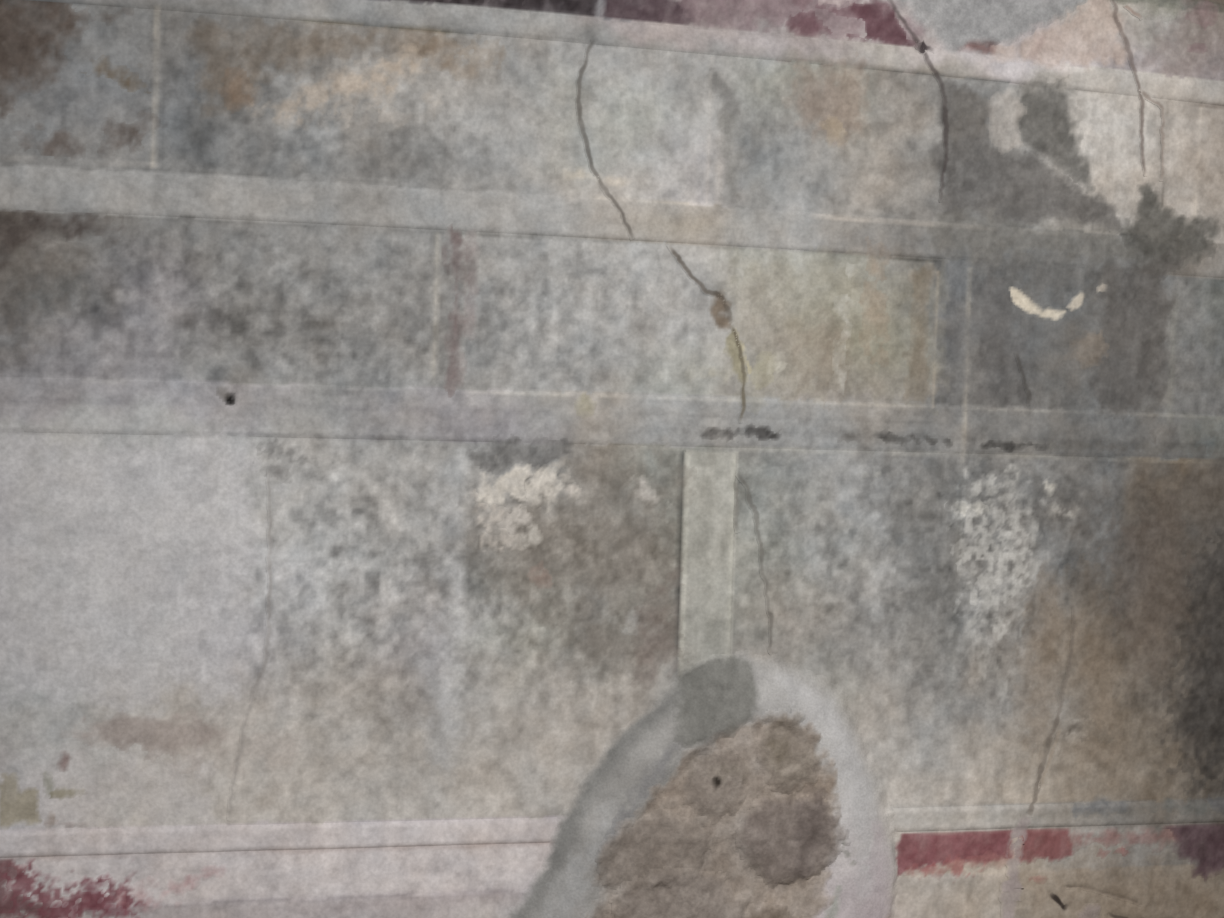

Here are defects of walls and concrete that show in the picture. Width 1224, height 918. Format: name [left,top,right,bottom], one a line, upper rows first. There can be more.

crack [575,39,635,241]
crack [887,0,950,202]
crack [1110,0,1166,181]
crack [667,244,747,423]
spalling [1008,281,1108,321]
damp [684,74,1224,822]
damp [410,427,744,788]
flaking render [583,708,851,918]
crack [998,608,1142,918]